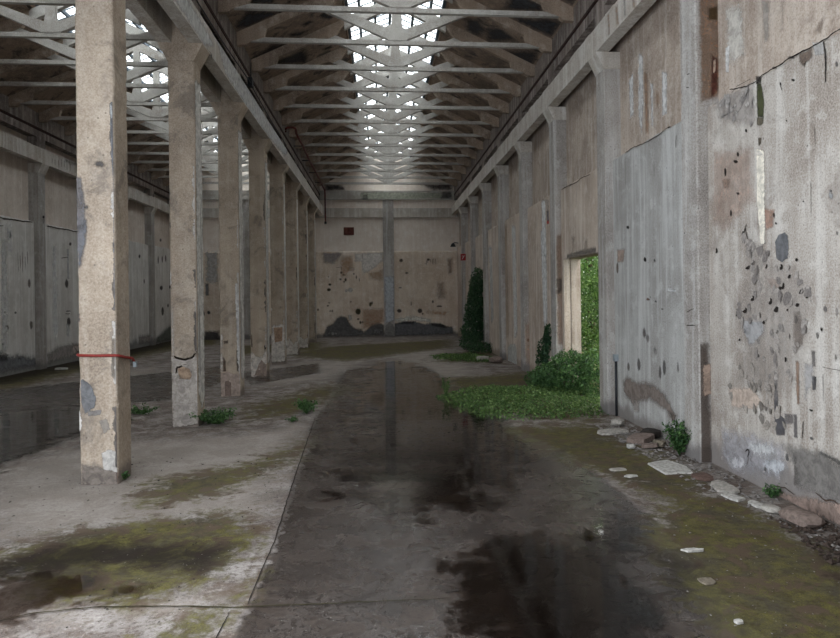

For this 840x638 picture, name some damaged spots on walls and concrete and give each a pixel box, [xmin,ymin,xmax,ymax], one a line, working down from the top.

water stain [323,276,453,337]
peeling [727,231,811,431]
water stain [623,359,675,420]
water stain [774,372,797,437]
water stain [788,447,840,504]